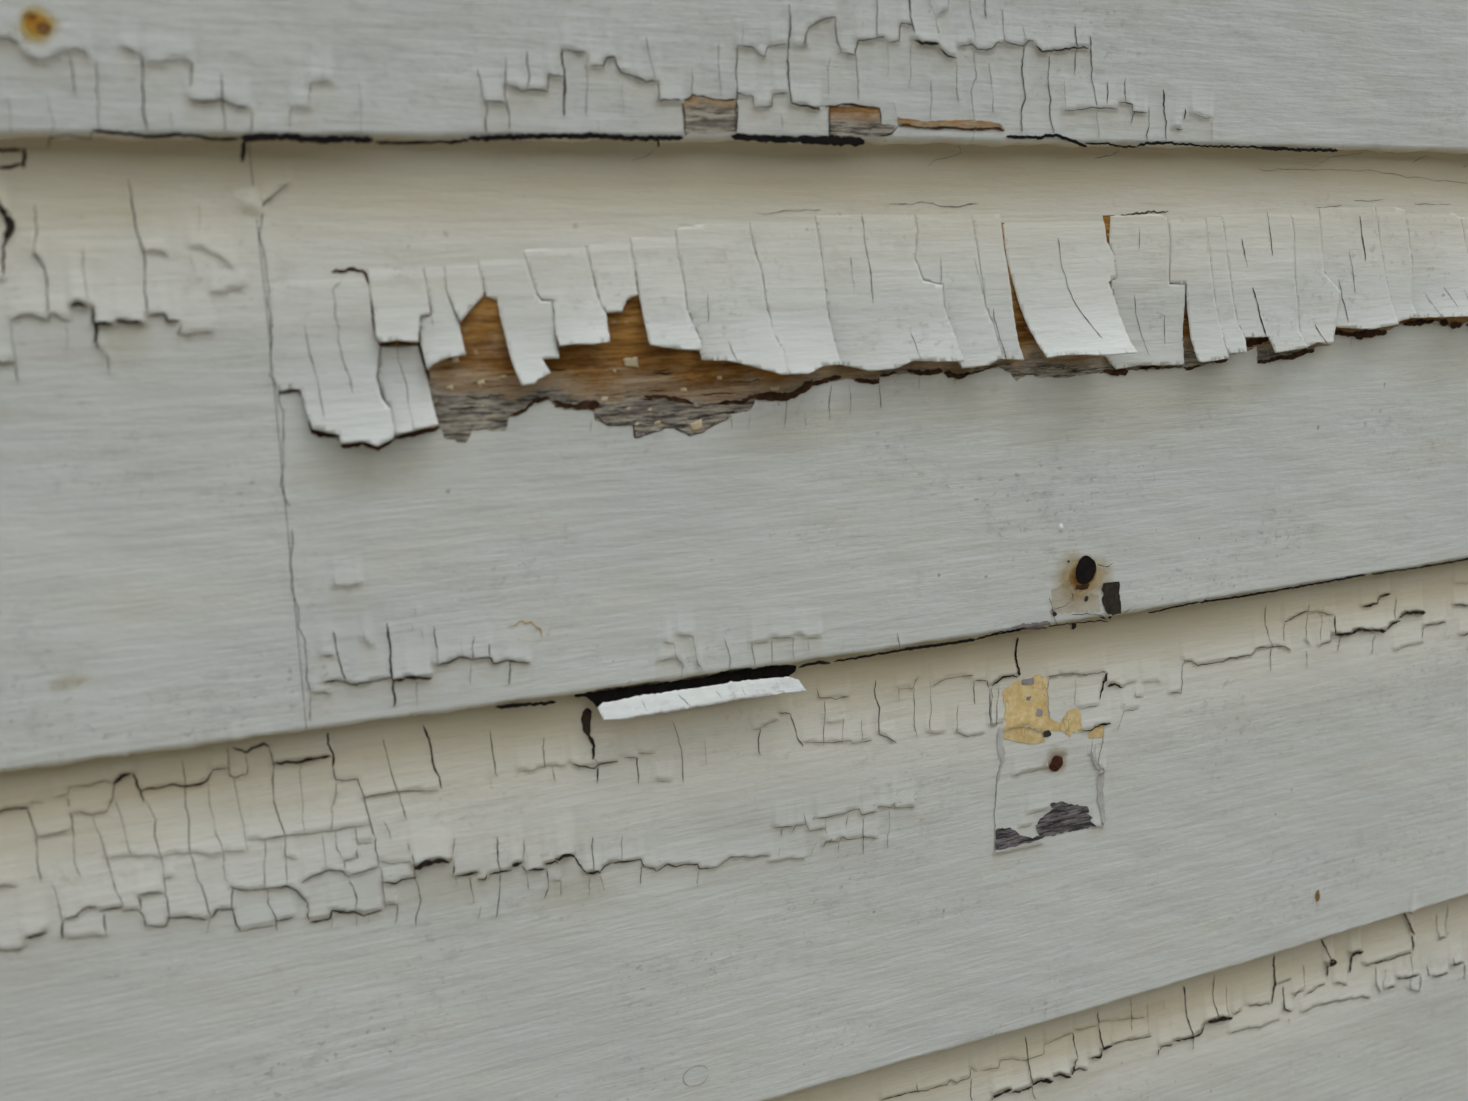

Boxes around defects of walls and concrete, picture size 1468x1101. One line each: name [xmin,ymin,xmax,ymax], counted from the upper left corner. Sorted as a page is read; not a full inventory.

corrosion [20,10,53,39]
crack [0,36,253,169]
crack [477,0,1213,140]
peeling [271,199,1468,451]
crack [0,178,912,926]
corrosion [1063,560,1101,597]
peeling [574,665,806,720]
peeling [1022,677,1051,737]
crack [758,593,1446,854]